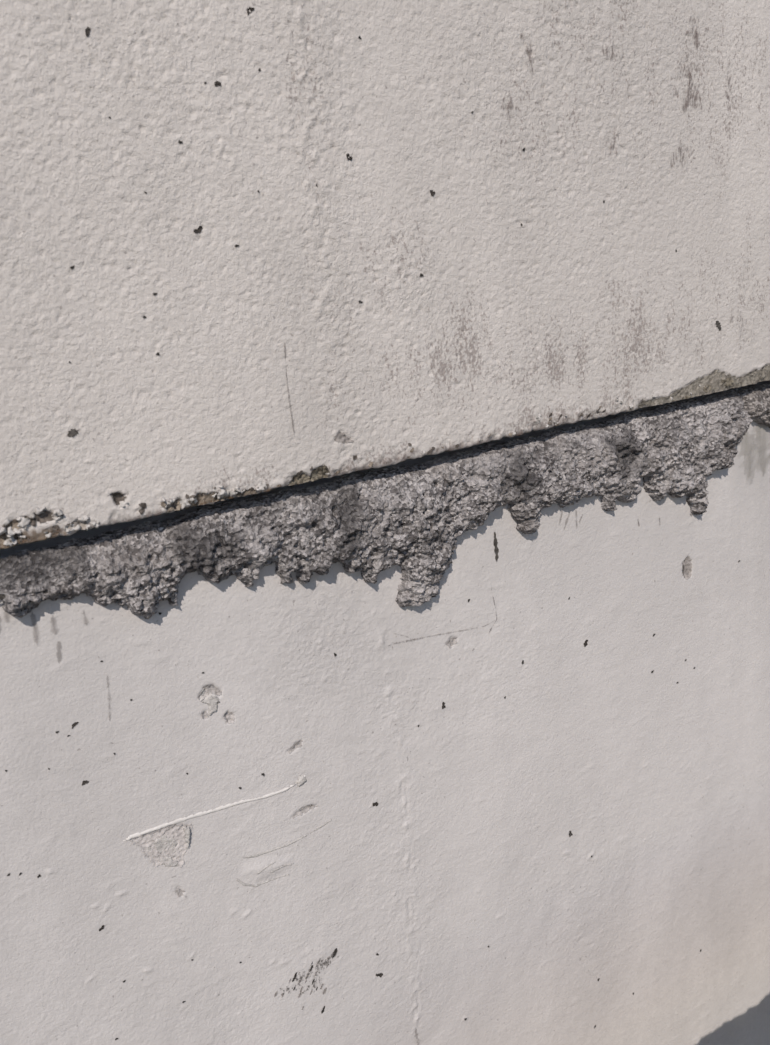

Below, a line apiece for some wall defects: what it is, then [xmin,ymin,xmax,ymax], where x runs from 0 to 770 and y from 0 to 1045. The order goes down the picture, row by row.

peeling [535,364,770,429]
peeling [334,432,354,443]
spalling [112,492,147,514]
spalling [161,465,340,513]
spalling [0,506,100,546]
crack [492,532,500,562]
peeling [682,557,692,579]